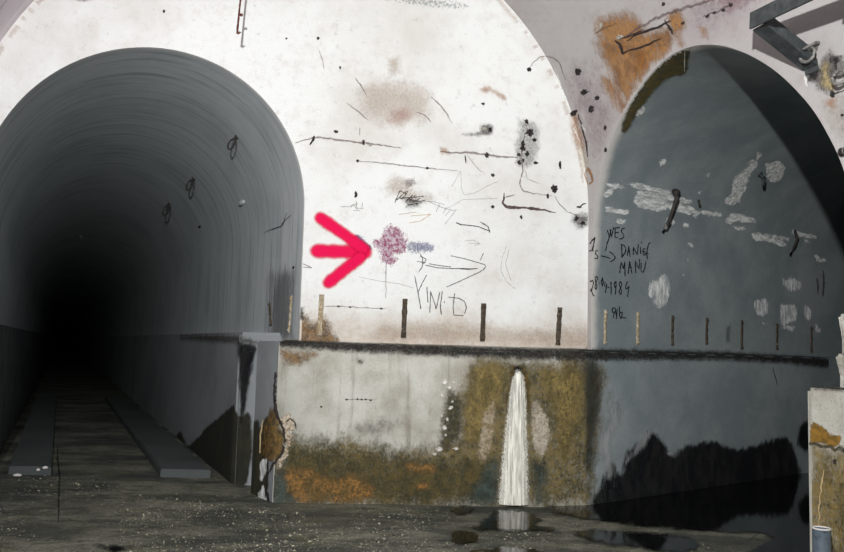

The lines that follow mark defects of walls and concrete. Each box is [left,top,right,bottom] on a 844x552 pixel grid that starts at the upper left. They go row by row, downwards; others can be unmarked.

corrosion [596,12,684,109]
peeling [603,152,817,247]
damp [176,333,268,499]
spalling [258,372,296,502]
damp [280,339,829,504]
corrosion [810,422,841,447]